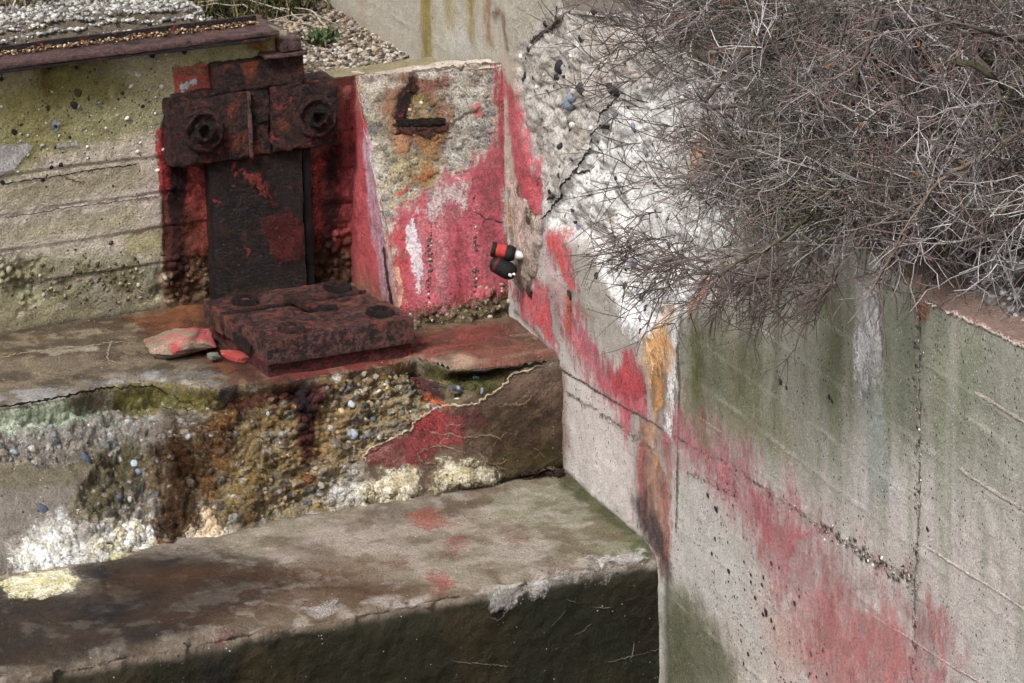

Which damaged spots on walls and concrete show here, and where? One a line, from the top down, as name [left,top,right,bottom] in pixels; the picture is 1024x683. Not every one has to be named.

crack [527,6,559,52]
rust [379,72,453,185]
crack [542,94,620,220]
rust [314,145,351,284]
crack [0,341,201,407]
crack [362,335,704,528]
damp [631,486,669,575]